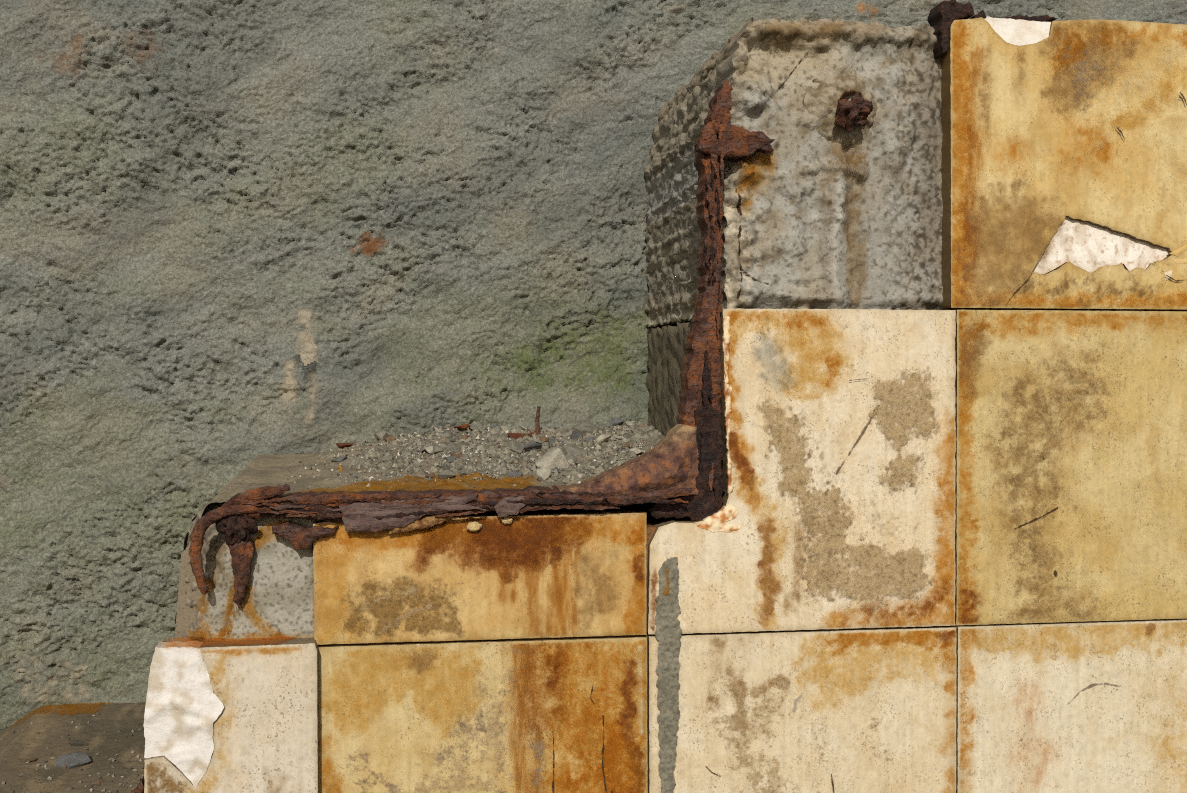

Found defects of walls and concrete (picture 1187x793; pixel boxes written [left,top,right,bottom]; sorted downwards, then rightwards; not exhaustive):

spalling [985,16,1051,46]
spalling [1033,217,1187,280]
corrosion [189,79,775,607]
spalling [143,641,225,788]